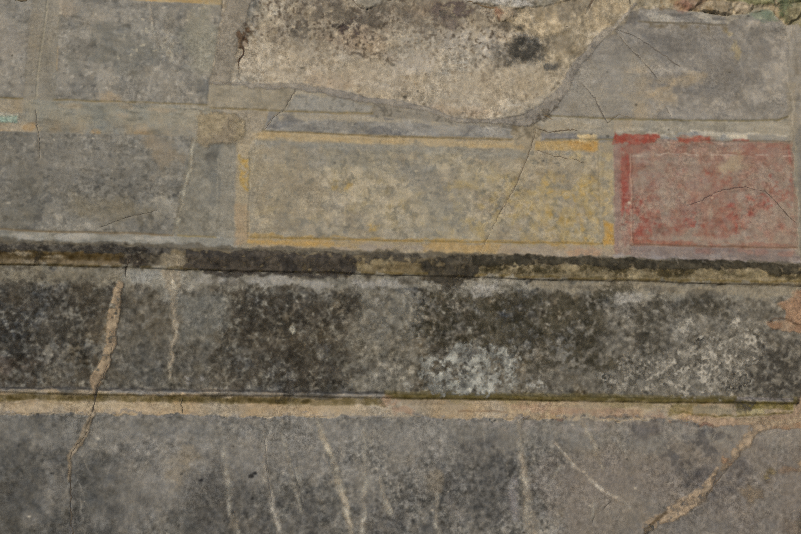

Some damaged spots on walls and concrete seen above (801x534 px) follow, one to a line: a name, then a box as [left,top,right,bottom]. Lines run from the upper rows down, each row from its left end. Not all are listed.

flaking render [229,0,666,124]
crack [616,29,680,82]
crack [582,84,631,123]
crack [479,115,583,255]
crack [687,186,799,225]
spalling [766,290,801,333]
crack [67,251,130,534]
spalling [663,397,801,430]
crack [644,417,771,534]